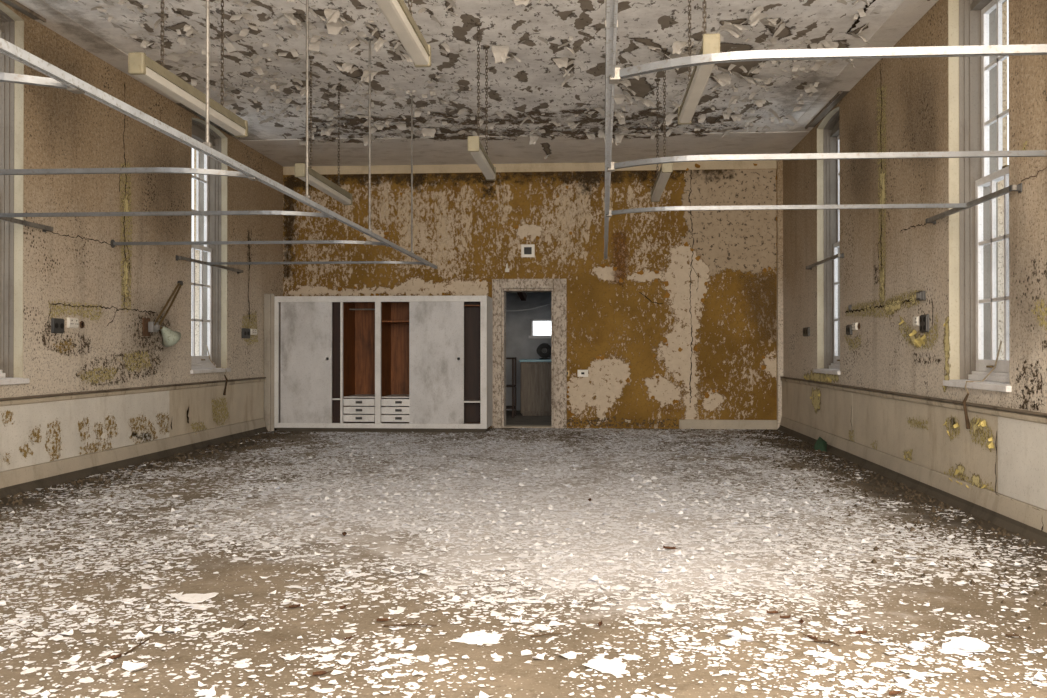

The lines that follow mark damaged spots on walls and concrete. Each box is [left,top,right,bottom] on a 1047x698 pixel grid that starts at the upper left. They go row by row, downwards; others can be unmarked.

peeling [91,0,879,160]
peeling [362,187,421,262]
peeling [433,184,476,265]
spalling [42,161,170,387]
peeling [286,274,491,296]
peeling [494,163,777,427]
spalling [1013,299,1047,410]
peeling [0,418,62,465]
peeling [78,413,169,455]
peeling [943,415,995,452]
peeling [944,464,994,491]
crack [995,433,1043,532]